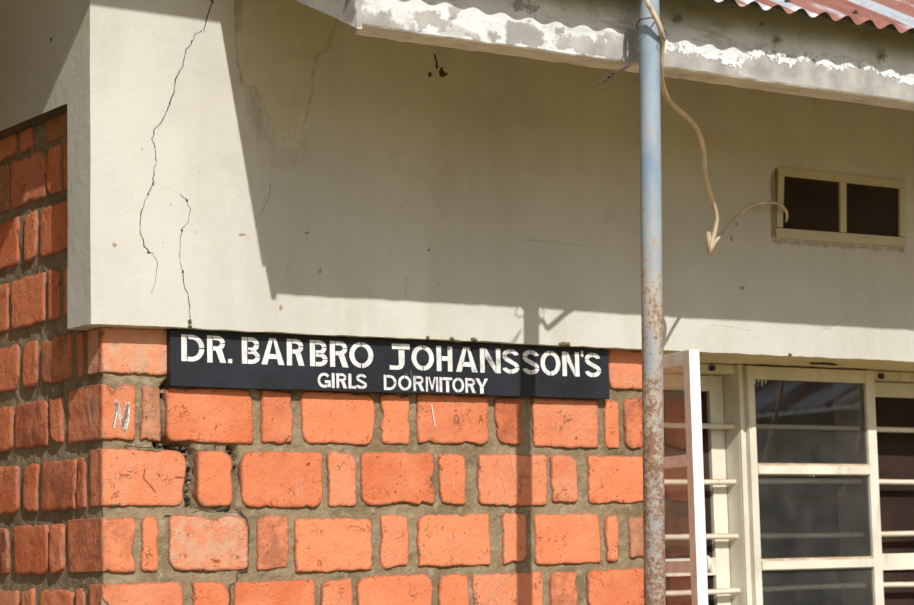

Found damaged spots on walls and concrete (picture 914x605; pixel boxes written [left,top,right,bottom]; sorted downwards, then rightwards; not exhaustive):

peeling [342,0,461,31]
peeling [465,0,639,62]
peeling [664,40,914,101]
crack [140,0,214,295]
crack [179,193,192,324]